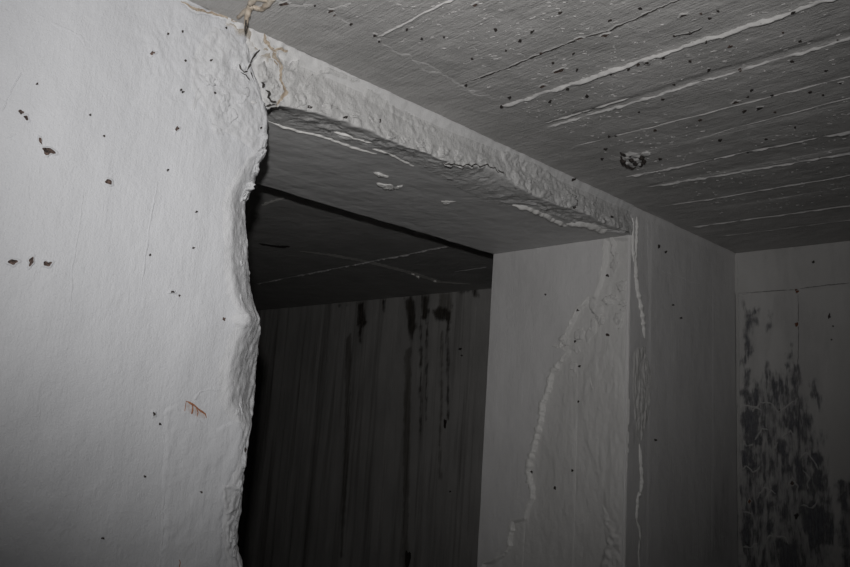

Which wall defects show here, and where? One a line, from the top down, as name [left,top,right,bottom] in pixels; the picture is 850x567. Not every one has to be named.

crack [238,33,291,110]
crack [381,0,679,96]
spalling [419,0,682,187]
crack [675,27,703,37]
crack [442,162,504,174]
spalling [180,27,646,567]
leakage [406,296,450,367]
crack [635,444,644,567]
leakage [740,355,850,567]